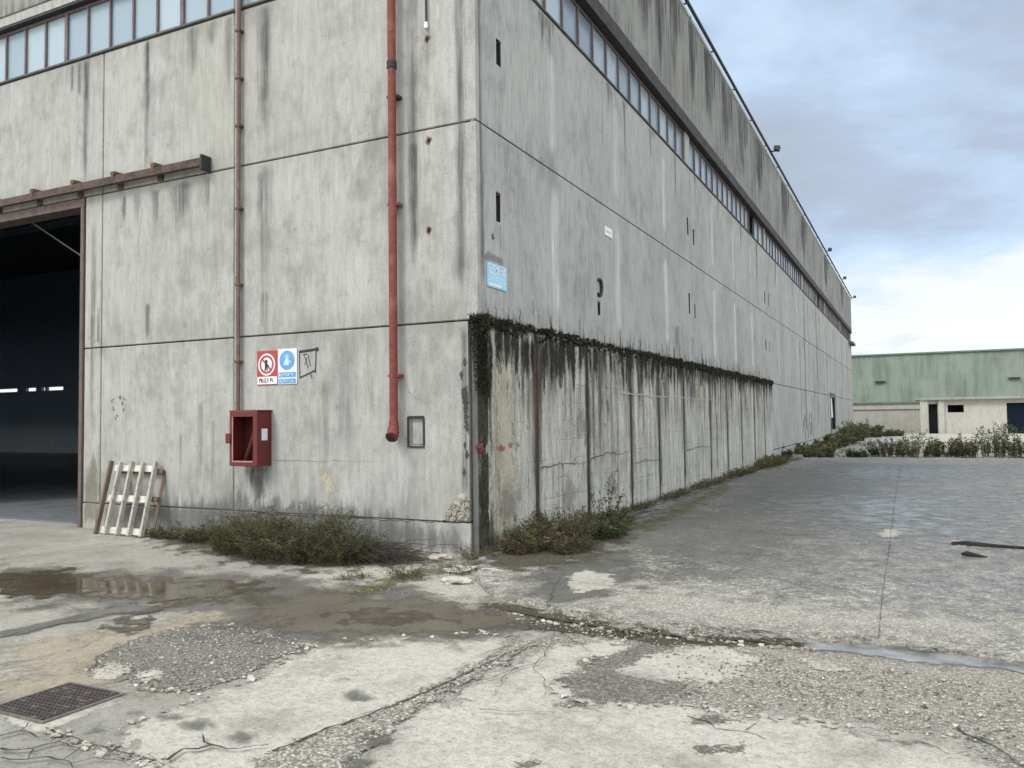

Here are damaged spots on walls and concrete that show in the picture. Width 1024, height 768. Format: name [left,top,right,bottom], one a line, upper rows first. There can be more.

water stain [493,332,524,539]
water stain [629,363,667,423]
water stain [683,368,732,474]
spalling [445,493,471,522]
spalling [128,629,347,715]
crack [0,565,805,768]
spalling [548,671,596,707]
spalling [501,611,816,666]
spalling [616,701,799,724]
spalling [43,725,181,768]